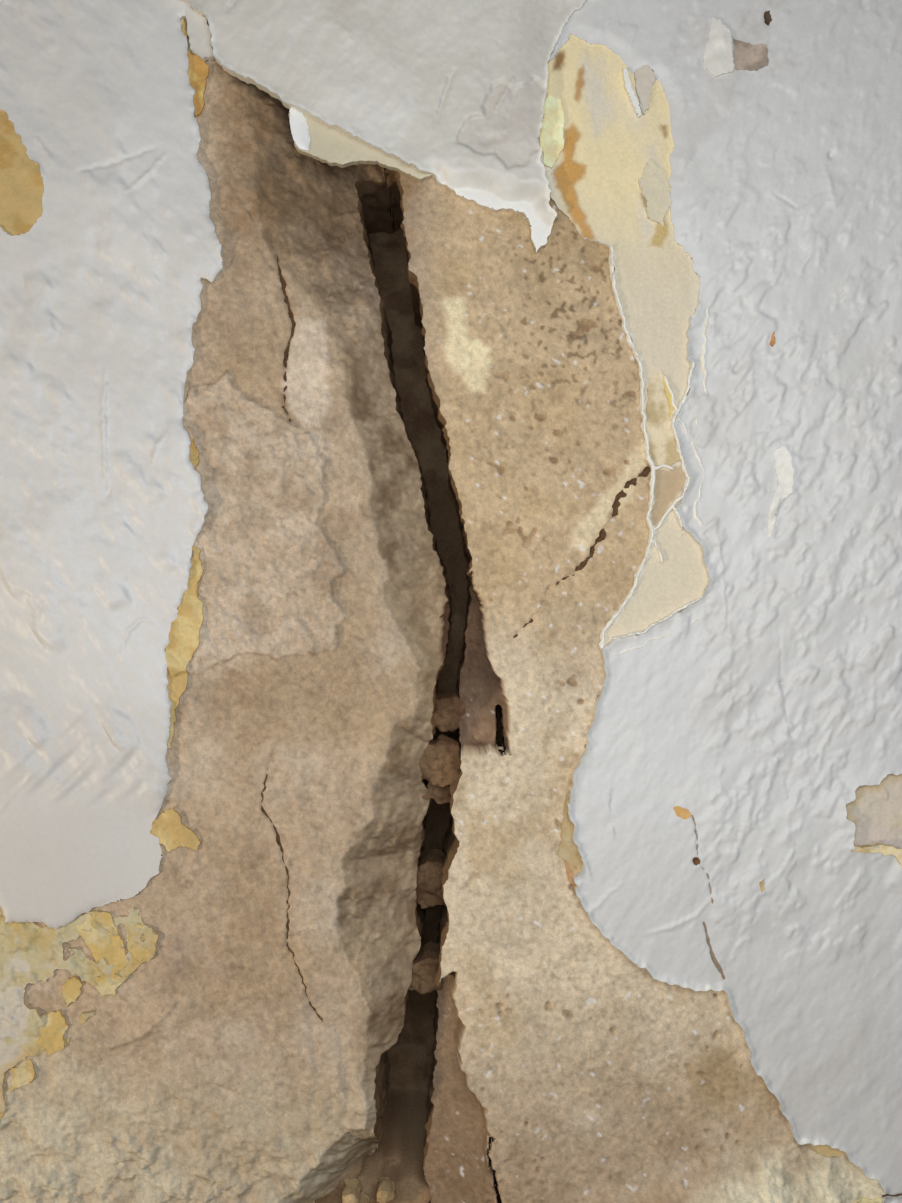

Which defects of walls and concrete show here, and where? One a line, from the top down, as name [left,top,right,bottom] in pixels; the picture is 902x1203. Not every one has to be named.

peeling [0,110,44,236]
flaking render [179,0,587,253]
peeling [538,34,709,650]
crack [369,229,469,695]
spalling [150,806,201,851]
spalling [165,546,204,748]
crack [423,799,452,852]
crack [433,727,458,741]
crack [495,704,506,755]
peeling [0,907,160,1120]
crack [314,990,437,1203]
crack [487,1137,502,1203]